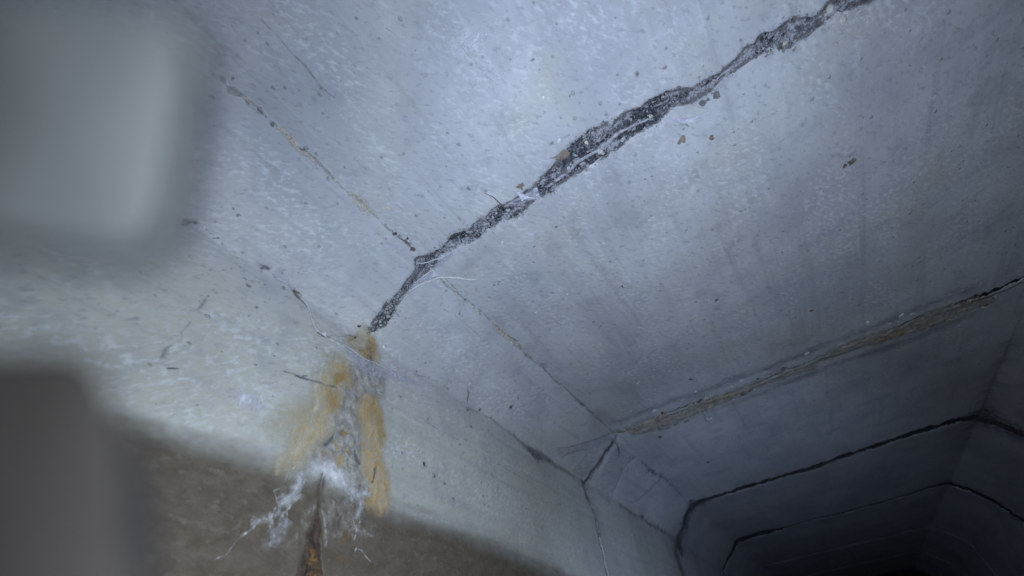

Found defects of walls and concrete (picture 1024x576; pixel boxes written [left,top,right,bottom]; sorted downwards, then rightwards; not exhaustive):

crack [286,0,872,407]
crack [893,276,1024,329]
damp [131,364,547,576]
corrosion [357,393,389,513]
crack [581,431,625,560]